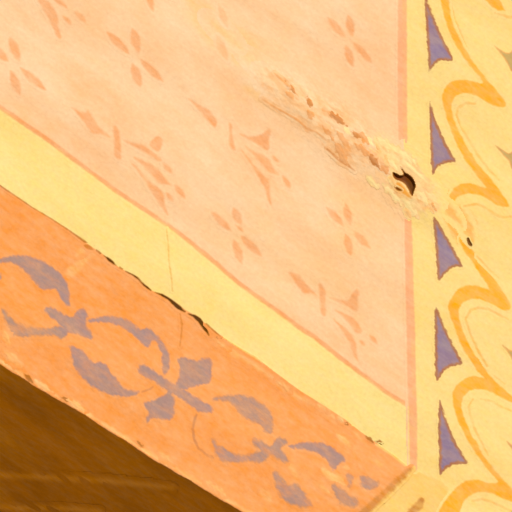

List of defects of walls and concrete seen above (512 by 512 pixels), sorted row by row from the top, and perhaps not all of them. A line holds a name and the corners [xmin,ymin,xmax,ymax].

flaking render [249,61,449,224]
crack [0,183,223,349]